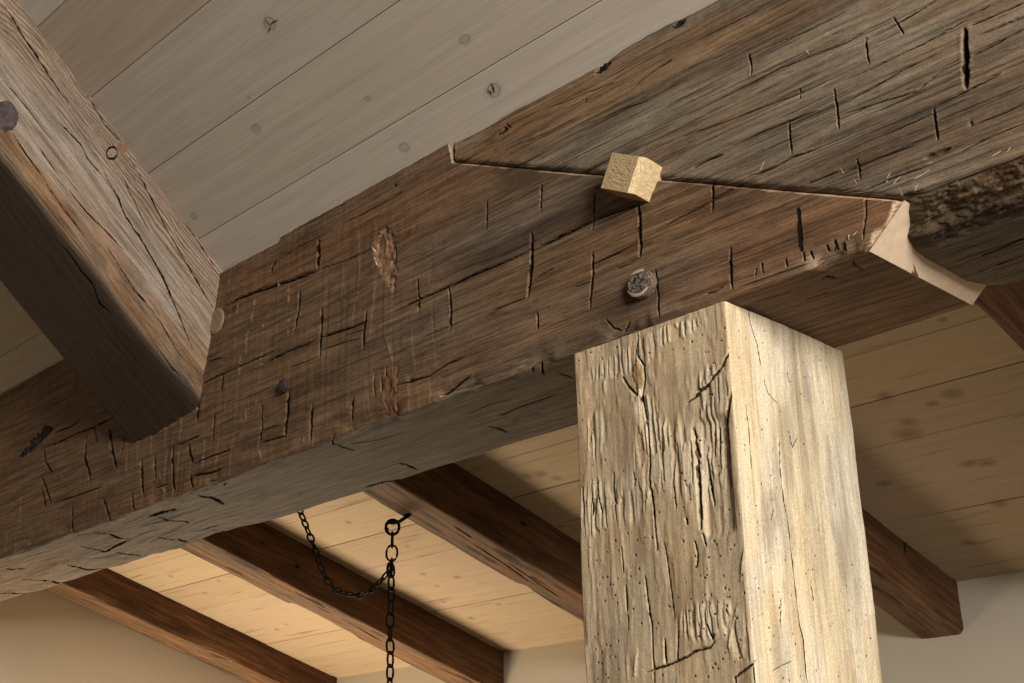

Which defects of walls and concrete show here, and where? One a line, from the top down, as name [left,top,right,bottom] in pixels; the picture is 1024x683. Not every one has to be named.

crack [807,3,1024,191]
crack [4,6,400,383]
crack [395,205,637,312]
crack [576,150,815,292]
crack [708,265,804,403]
crack [607,320,707,683]